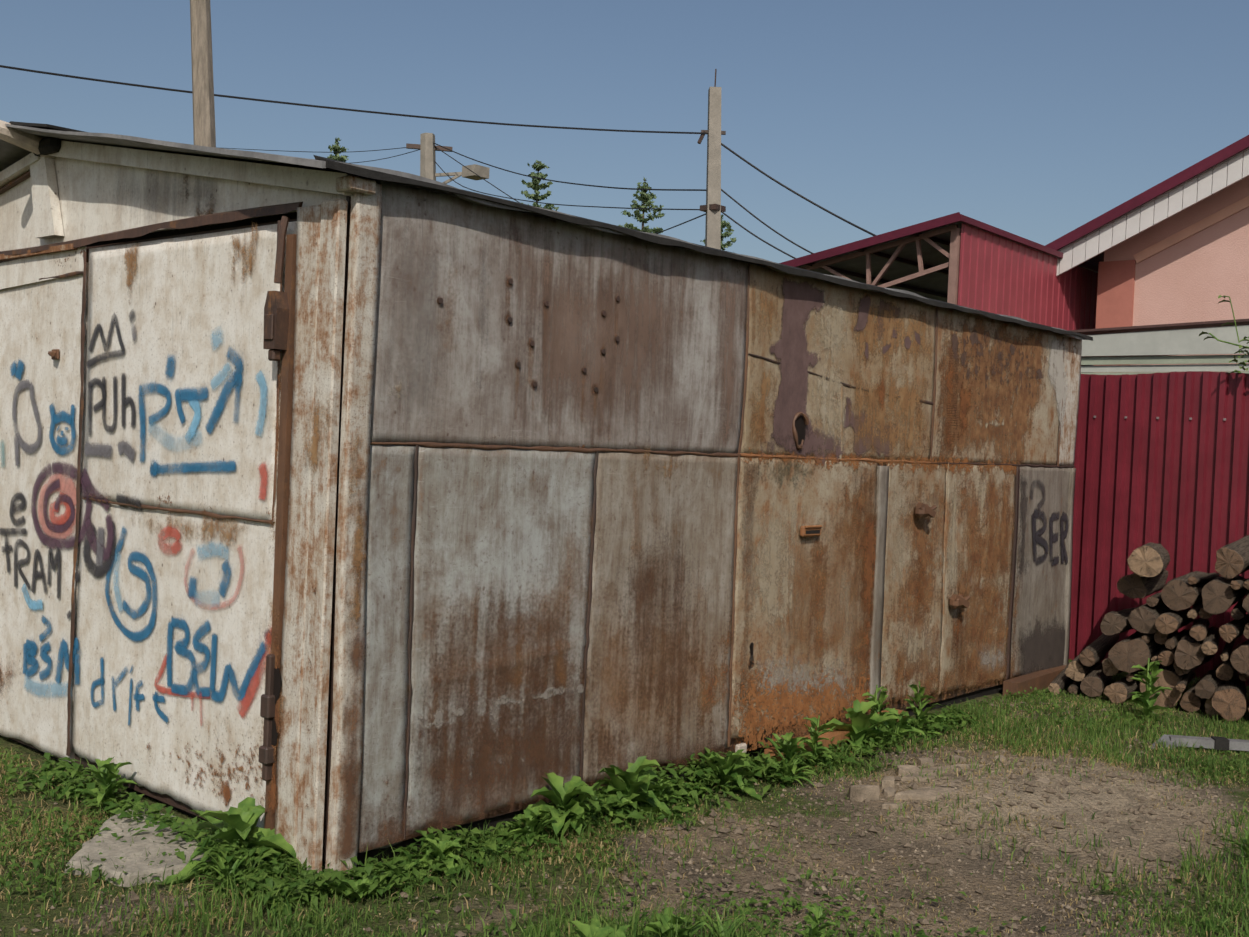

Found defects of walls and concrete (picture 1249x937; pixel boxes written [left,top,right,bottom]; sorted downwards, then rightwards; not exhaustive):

corrosion [506,242,691,432]
corrosion [303,404,329,470]
corrosion [349,515,366,675]
corrosion [599,278,1047,771]
corrosion [338,691,410,859]
corrosion [419,585,584,831]